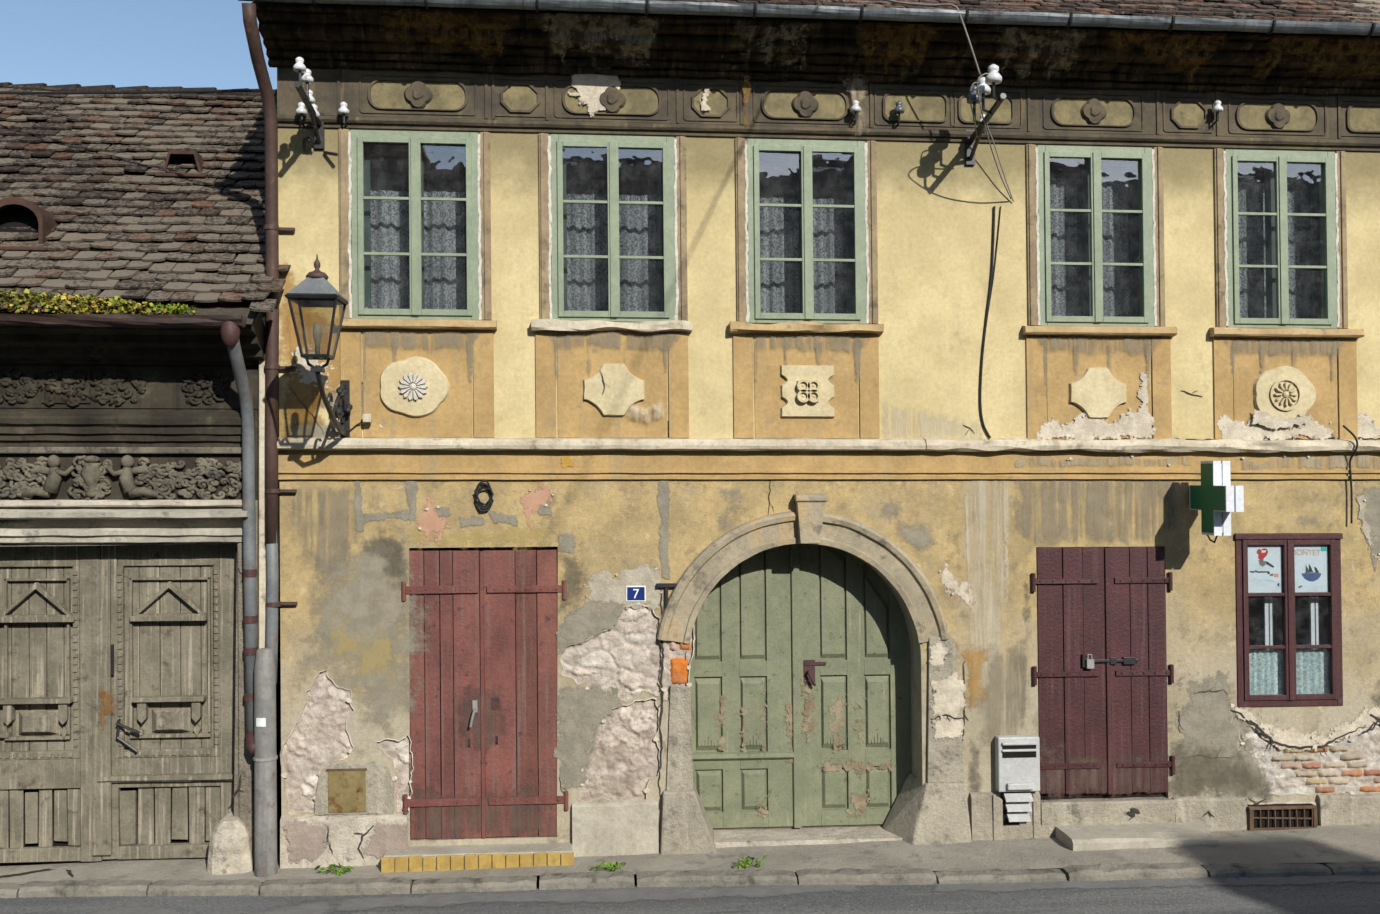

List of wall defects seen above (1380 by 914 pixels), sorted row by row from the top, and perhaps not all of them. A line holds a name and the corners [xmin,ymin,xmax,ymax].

peeling [568,67,621,116]
peeling [1015,371,1188,467]
peeling [1217,405,1380,470]
flaking render [280,541,423,863]
spalling [560,563,695,803]
peeling [929,640,966,740]
spalling [1167,670,1380,799]